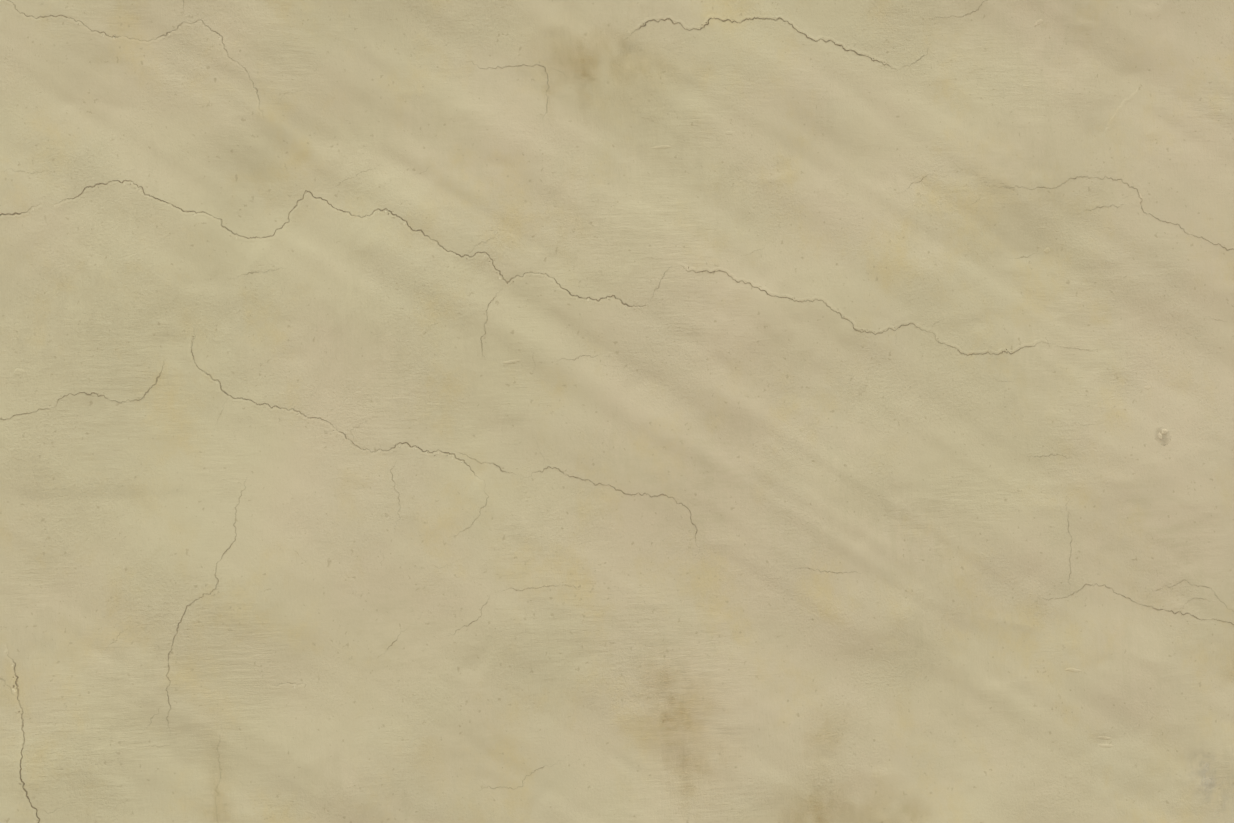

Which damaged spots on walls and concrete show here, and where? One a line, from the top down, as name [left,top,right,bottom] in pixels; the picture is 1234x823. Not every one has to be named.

crack [628,14,900,71]
crack [0,180,650,311]
crack [677,262,1048,355]
crack [3,645,40,823]